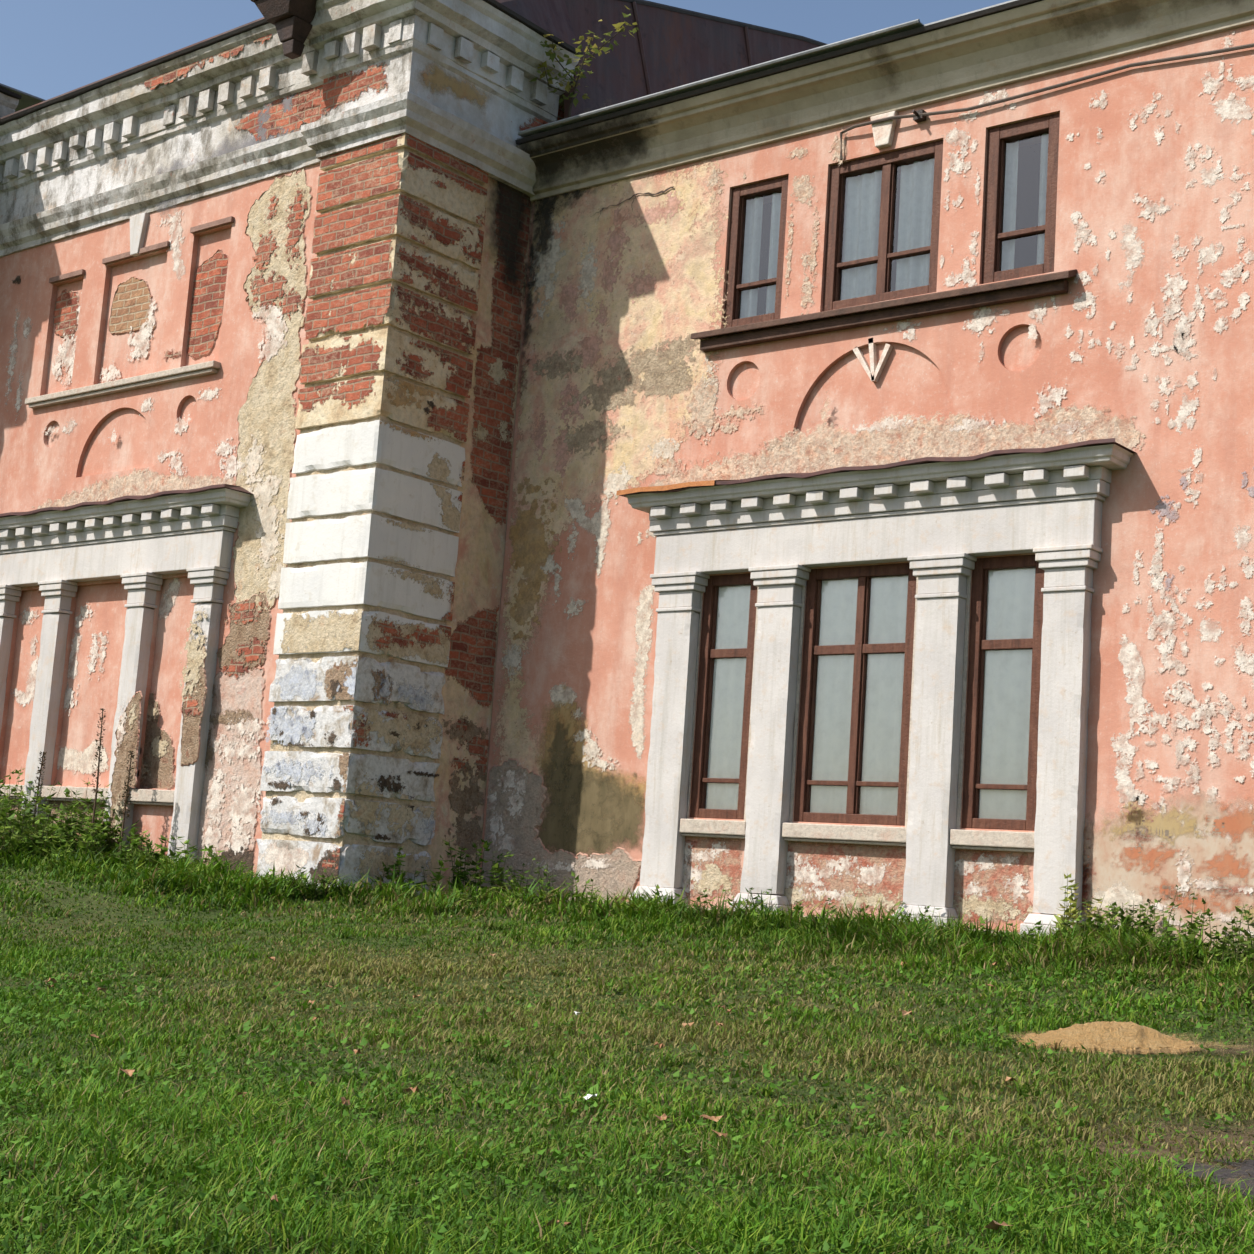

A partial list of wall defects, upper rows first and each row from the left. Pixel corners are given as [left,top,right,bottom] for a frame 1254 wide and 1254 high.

flaking render [137,34,272,90]
spalling [235,62,388,142]
peeling [828,126,848,164]
peeling [943,88,1017,213]
peeling [1129,92,1180,145]
peeling [1198,31,1254,135]
leakage [492,113,653,394]
flaking render [32,133,1254,900]
leakage [535,687,646,857]
spalling [762,841,908,916]
spalling [947,849,1033,926]
leakage [1081,793,1254,949]